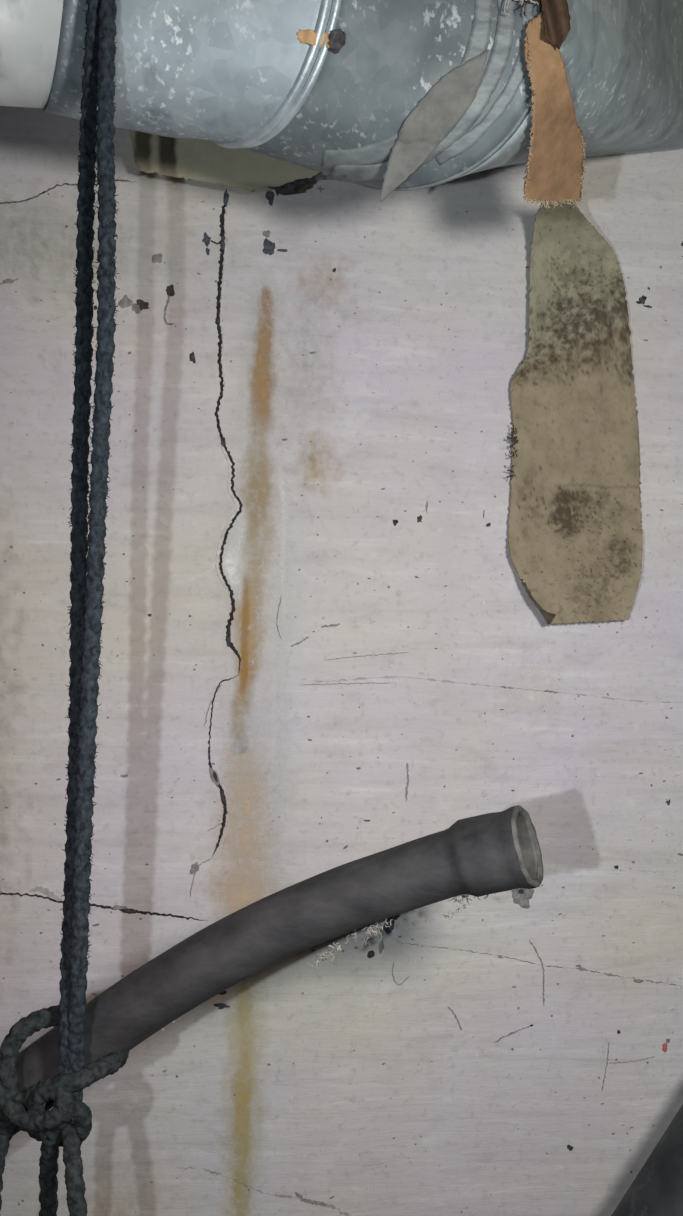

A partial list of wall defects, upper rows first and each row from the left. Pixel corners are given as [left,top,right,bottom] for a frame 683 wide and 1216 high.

crack [0,176,136,204]
corrosion [253,291,271,433]
crack [0,189,243,921]
corrosion [235,460,269,714]
corrosion [226,760,262,914]